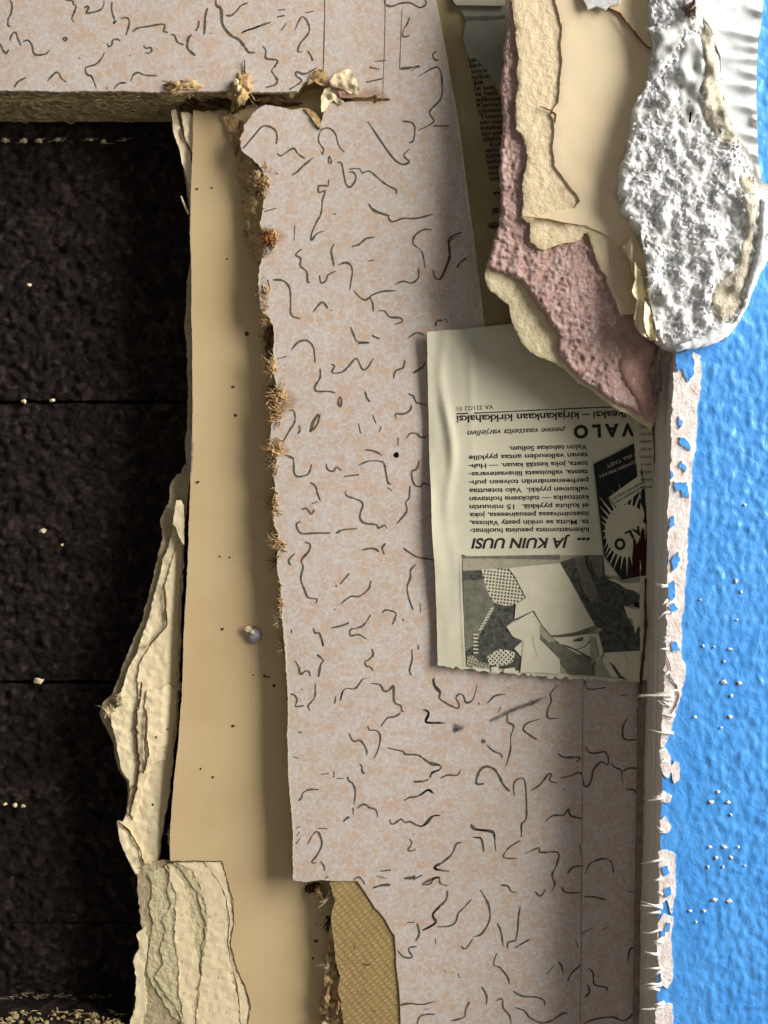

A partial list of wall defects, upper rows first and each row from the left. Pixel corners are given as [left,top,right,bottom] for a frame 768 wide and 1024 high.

peeling [171,109,193,229]
peeling [699,0,768,189]
peeling [485,0,702,803]
peeling [100,247,252,1024]
peeling [657,816,671,833]
peeling [640,850,676,1024]